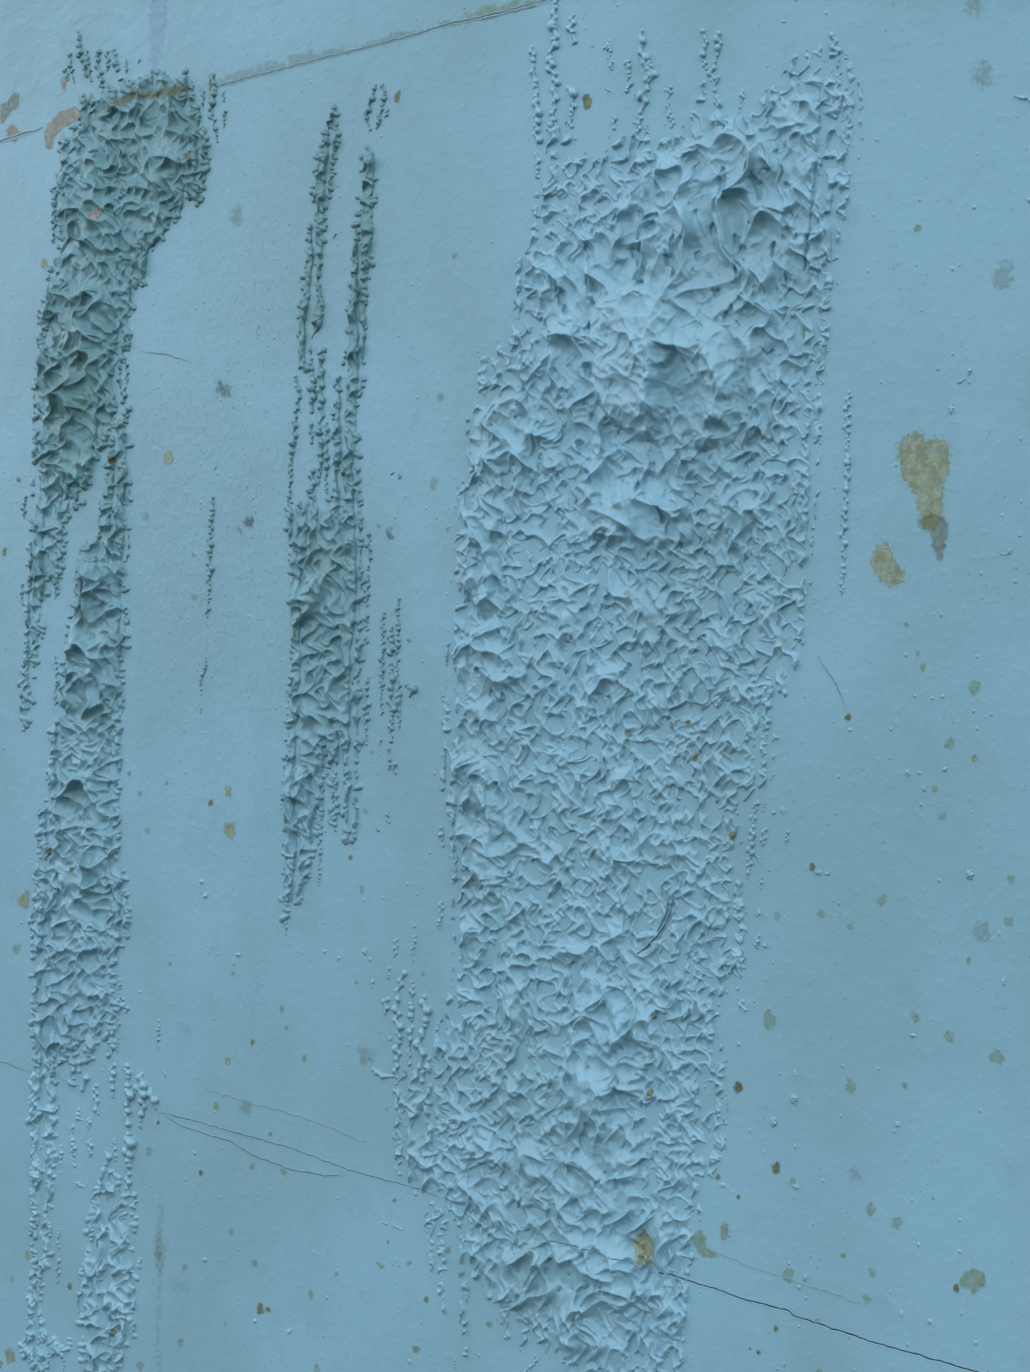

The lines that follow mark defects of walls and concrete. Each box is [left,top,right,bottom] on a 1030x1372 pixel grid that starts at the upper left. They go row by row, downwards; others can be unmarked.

leakage [897,431,950,529]
leakage [870,542,905,588]
crack [158,1088,444,1199]
crack [534,1226,984,1372]